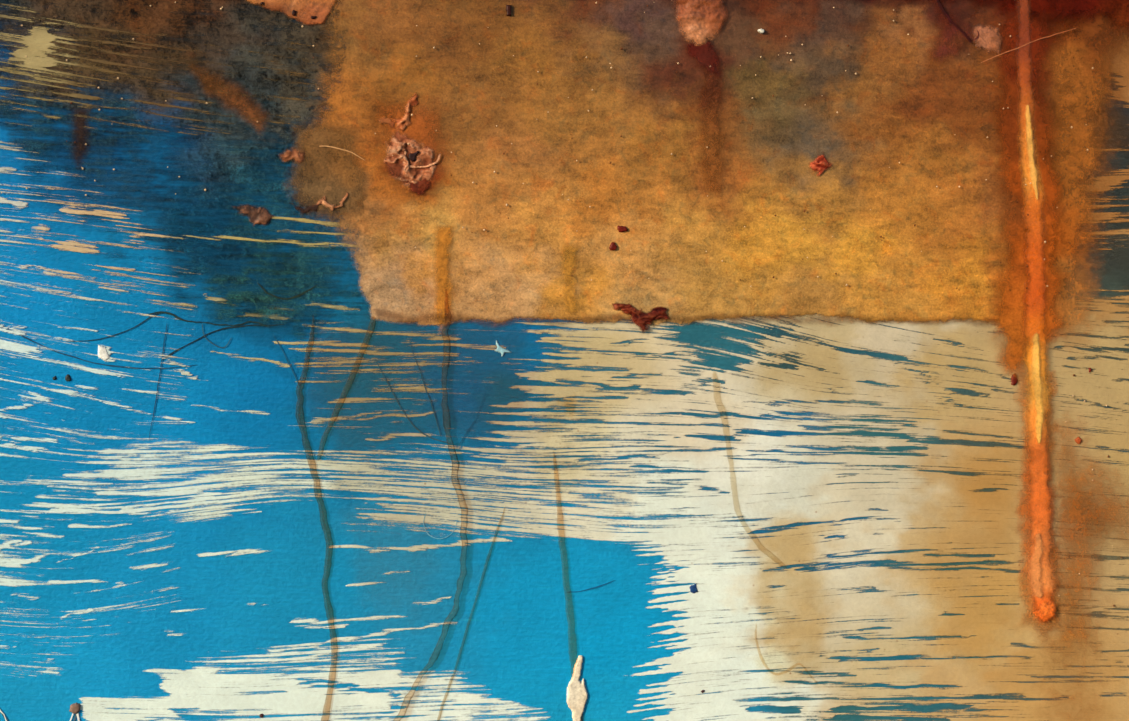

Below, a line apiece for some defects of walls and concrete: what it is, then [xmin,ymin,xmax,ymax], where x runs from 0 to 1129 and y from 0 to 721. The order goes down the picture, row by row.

corrosion [279,0,1129,640]